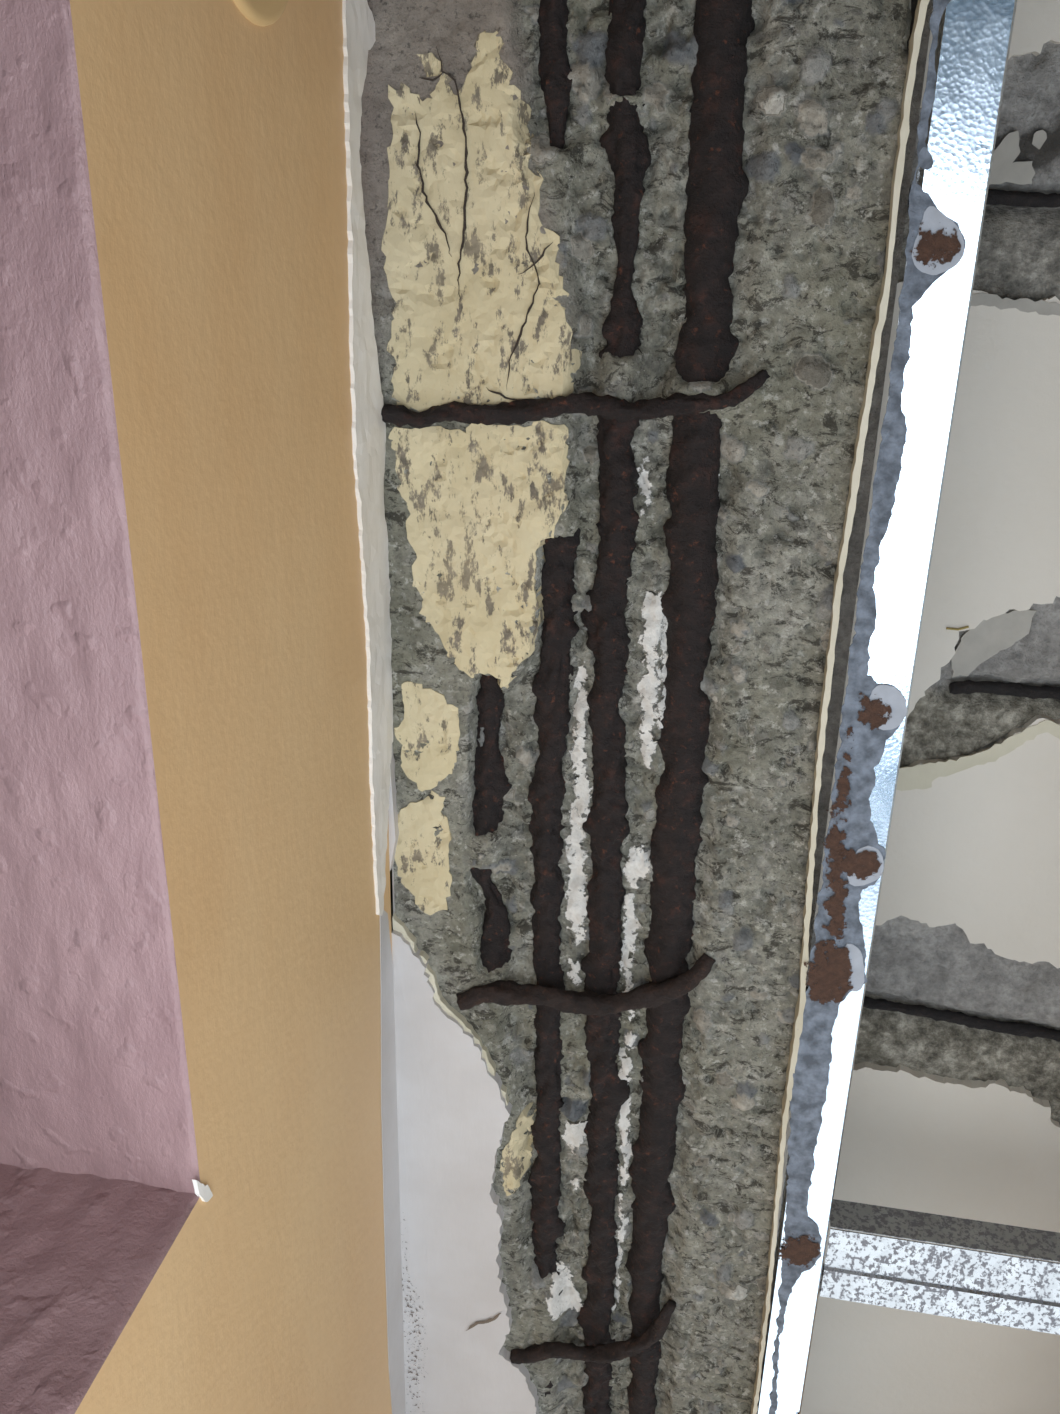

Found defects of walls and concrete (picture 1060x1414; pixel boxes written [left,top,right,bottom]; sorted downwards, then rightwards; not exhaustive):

crack [415,46,469,299]
crack [486,193,553,401]
rust [910,223,961,268]
spalling [970,41,1060,316]
spalling [359,0,922,1414]
spalling [896,596,1060,791]
rust [804,692,892,1005]
spalling [854,915,1060,1124]
rust [778,1234,822,1269]